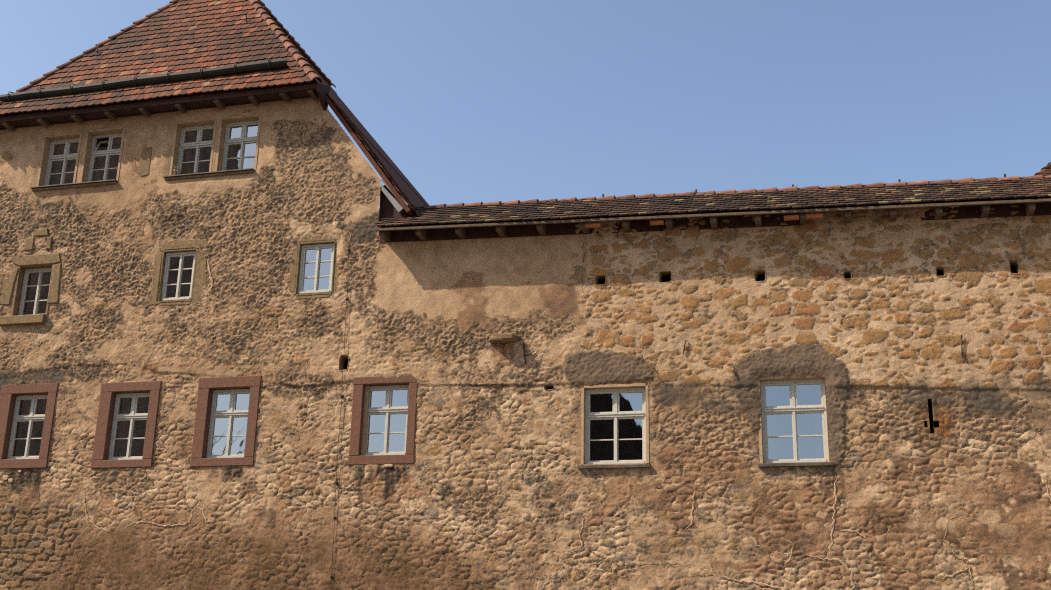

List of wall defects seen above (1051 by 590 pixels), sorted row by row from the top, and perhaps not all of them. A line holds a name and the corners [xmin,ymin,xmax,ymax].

spalling [0,119,584,437]
damp [370,466,407,498]
crack [582,560,695,568]